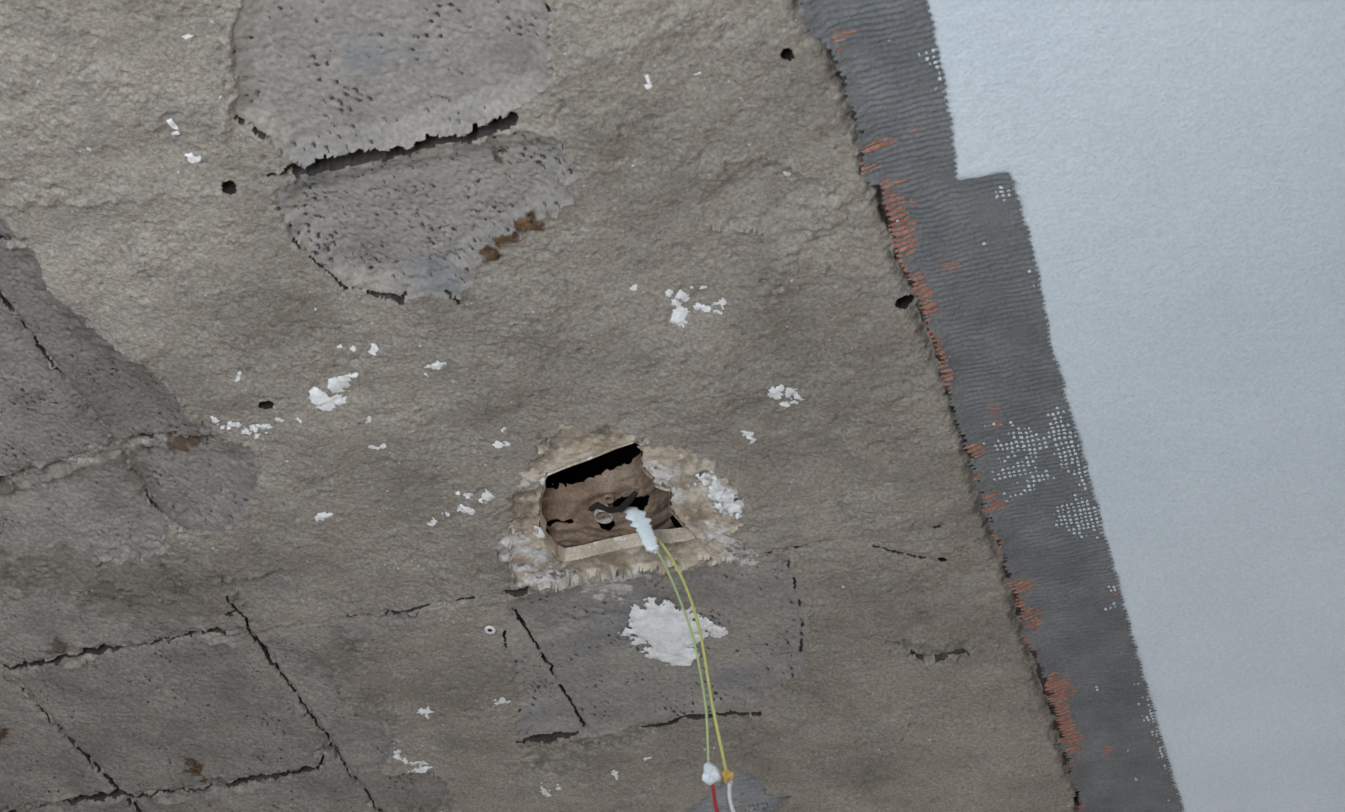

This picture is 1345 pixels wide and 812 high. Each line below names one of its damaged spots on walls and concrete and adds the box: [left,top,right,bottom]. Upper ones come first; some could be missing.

peeling [184,153,202,163]
crack [234,115,267,140]
crack [266,111,519,178]
crack [0,292,61,372]
crack [130,468,164,513]
spalling [0,218,450,812]
peeling [427,489,494,526]
spalling [499,423,809,797]
crack [765,546,804,652]
crack [0,576,383,812]
crack [640,710,762,728]